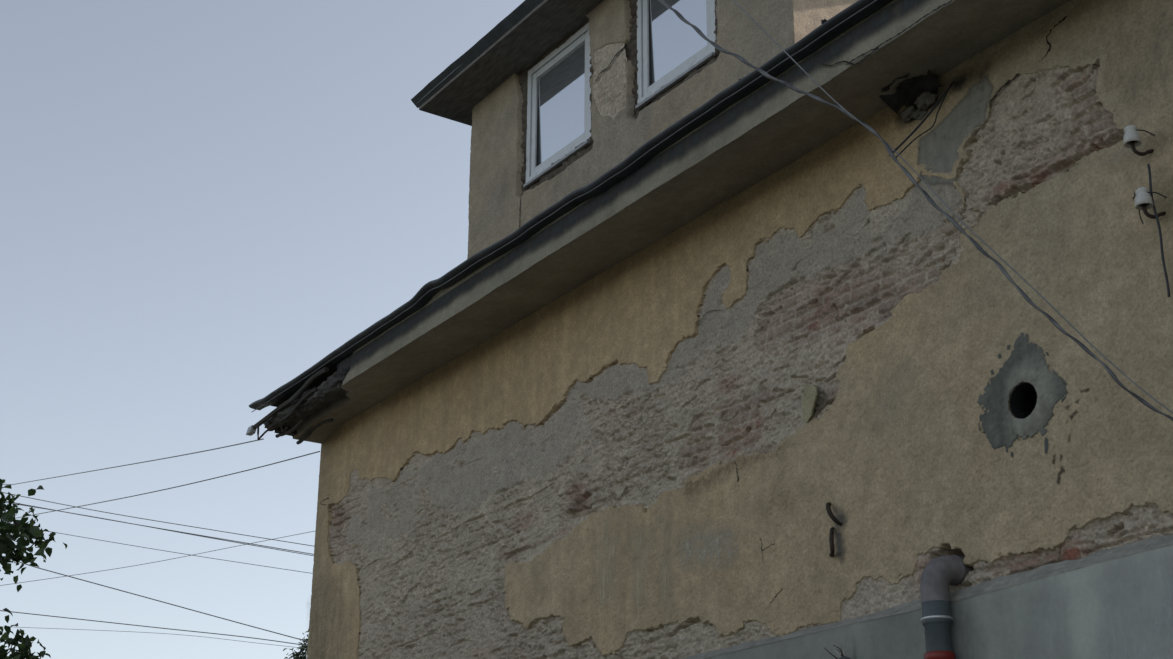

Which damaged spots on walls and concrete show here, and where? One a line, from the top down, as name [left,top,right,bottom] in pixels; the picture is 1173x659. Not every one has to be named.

spalling [517,0,720,196]
spalling [879,70,943,122]
spalling [953,65,1124,214]
spalling [246,367,349,445]
spalling [840,503,1173,621]